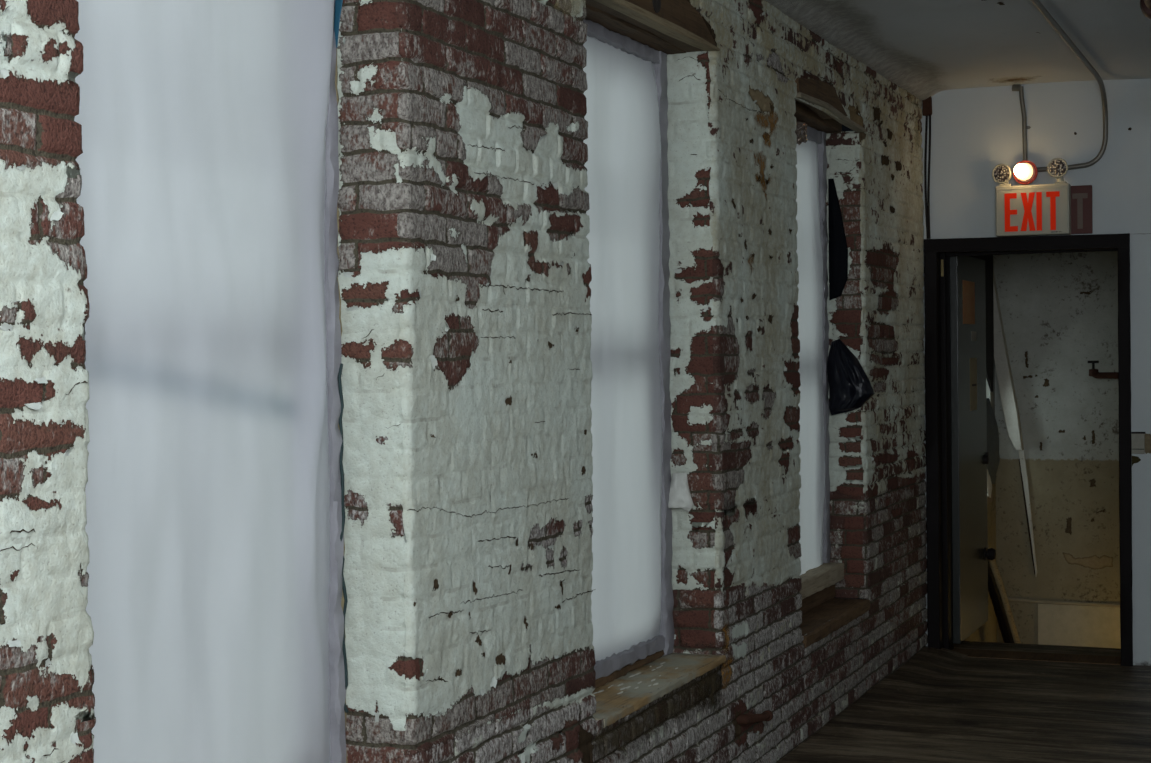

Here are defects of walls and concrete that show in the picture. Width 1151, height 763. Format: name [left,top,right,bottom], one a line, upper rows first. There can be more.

peeling [0,0,90,511]
peeling [337,0,592,390]
peeling [676,167,711,228]
peeling [829,188,900,392]
flaking render [848,102,902,181]
peeling [671,247,802,648]
peeling [837,410,917,520]
peeling [0,570,20,625]
peeling [78,569,89,587]
crack [409,487,596,634]
peeling [0,633,96,763]
peeling [345,635,596,763]